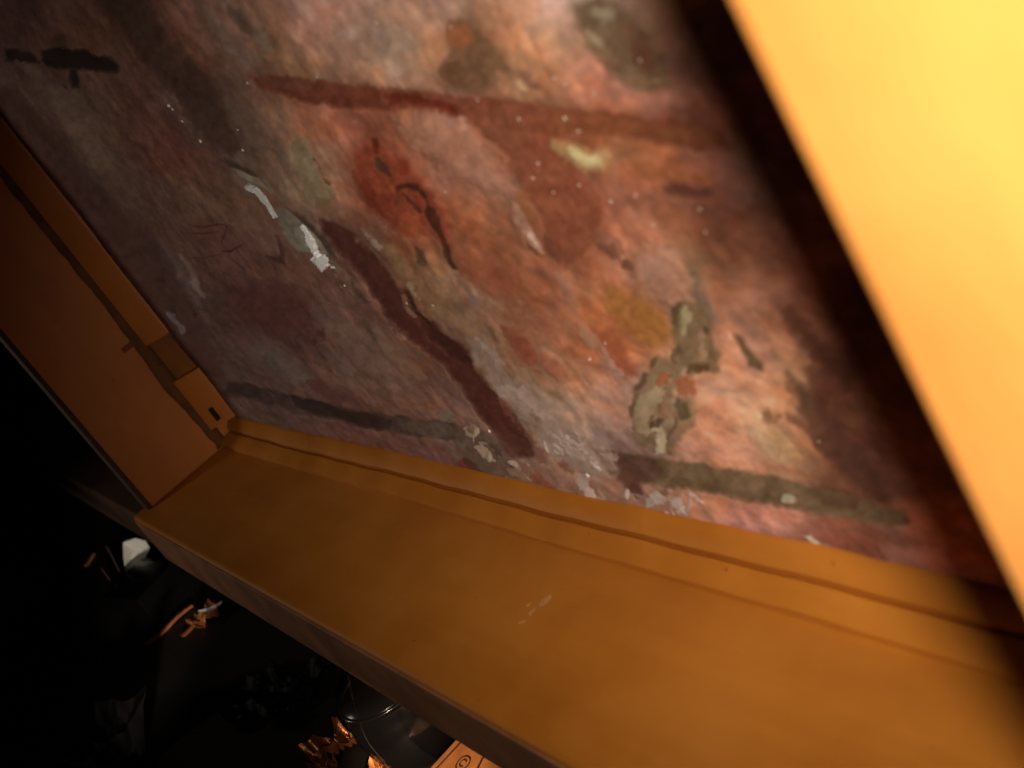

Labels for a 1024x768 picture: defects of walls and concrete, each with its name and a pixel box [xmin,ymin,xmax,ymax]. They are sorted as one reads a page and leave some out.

peeling [224,156,374,304]
peeling [627,263,724,457]
flaking render [452,421,531,480]